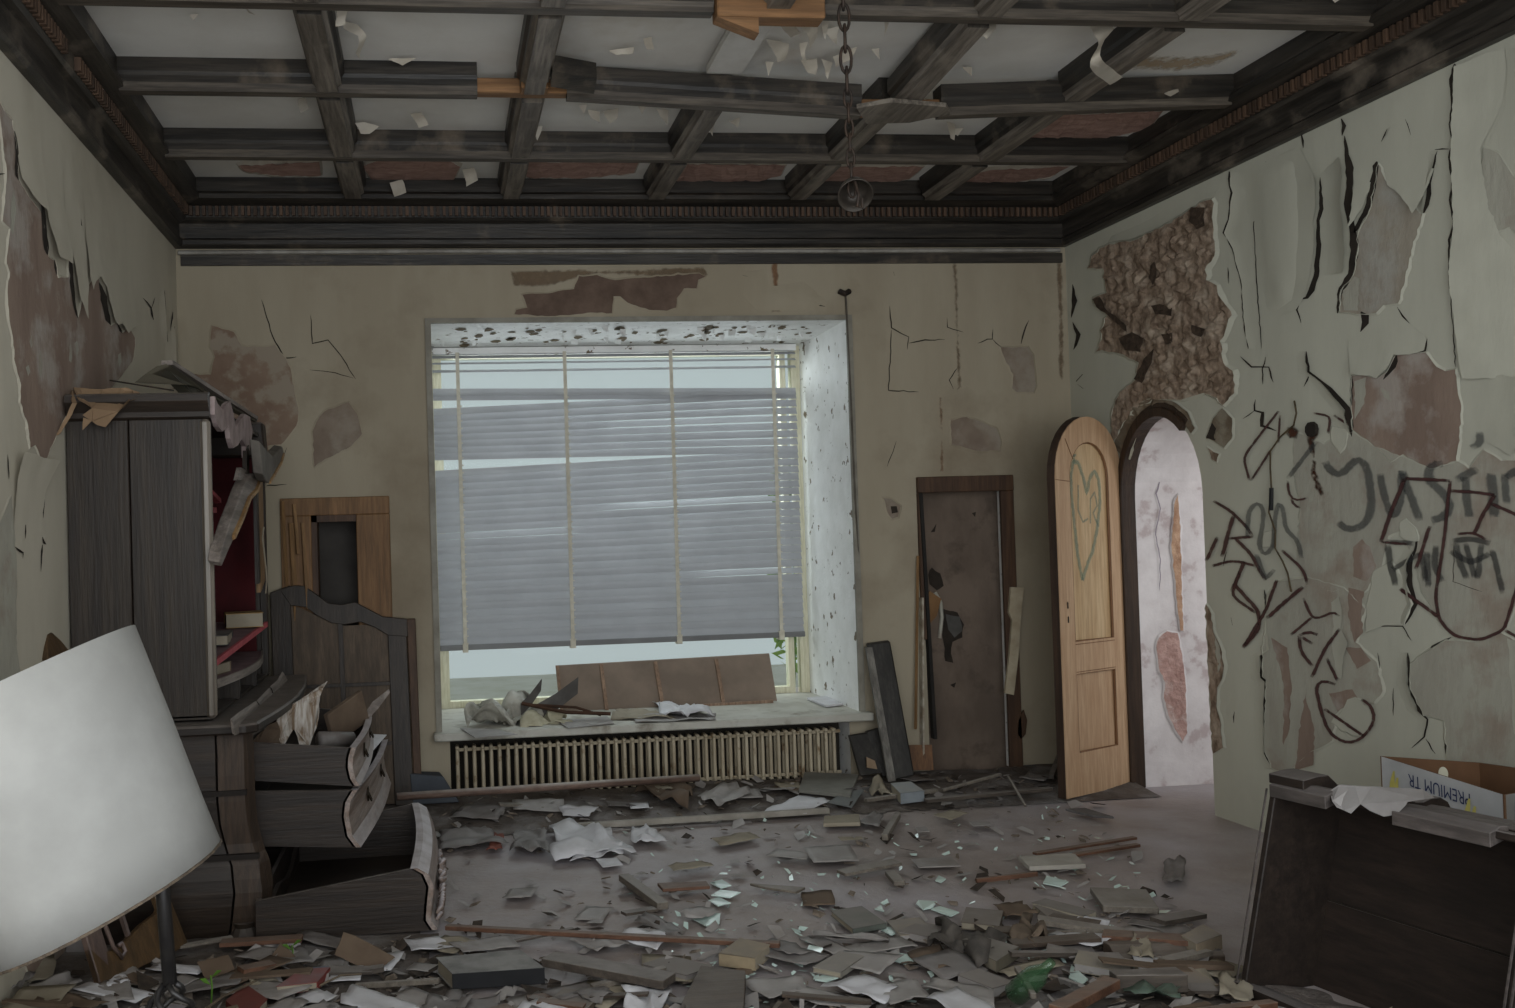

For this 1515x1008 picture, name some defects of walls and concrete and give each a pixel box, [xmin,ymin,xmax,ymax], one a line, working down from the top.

peeling [0,99,137,681]
peeling [193,324,363,487]
crack [262,302,356,379]
peeling [440,272,812,347]
crack [888,312,1029,392]
peeling [999,345,1037,394]
spalling [1087,191,1240,463]
crack [1223,50,1515,455]
peeling [1260,127,1515,772]
spalling [1155,494,1189,743]
spalling [1204,602,1228,755]
crack [1378,540,1451,753]